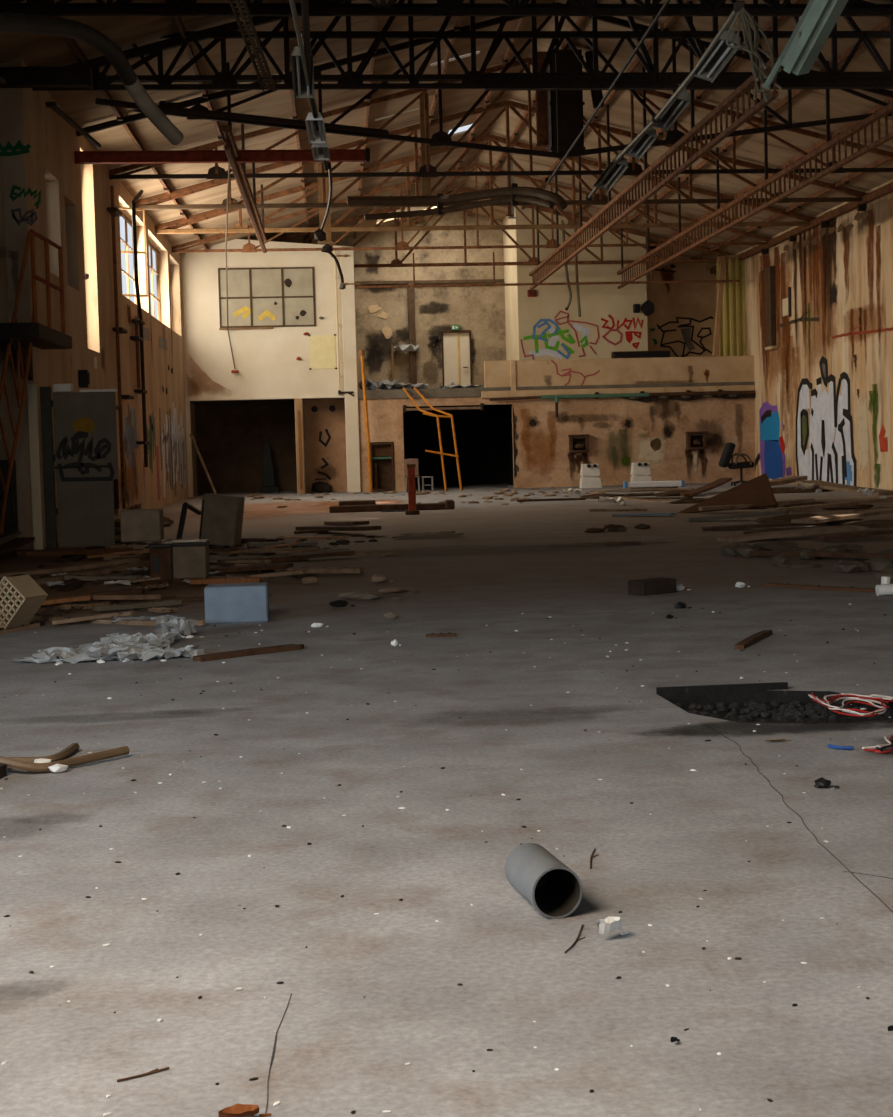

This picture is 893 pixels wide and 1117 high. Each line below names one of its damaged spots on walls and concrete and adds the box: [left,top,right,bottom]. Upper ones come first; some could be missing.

corrosion [850,209,881,369]
leakage [420,302,448,314]
corrosion [759,210,849,403]
leakage [396,328,409,342]
leakage [365,346,382,372]
leakage [429,336,442,367]
crack [701,723,893,913]